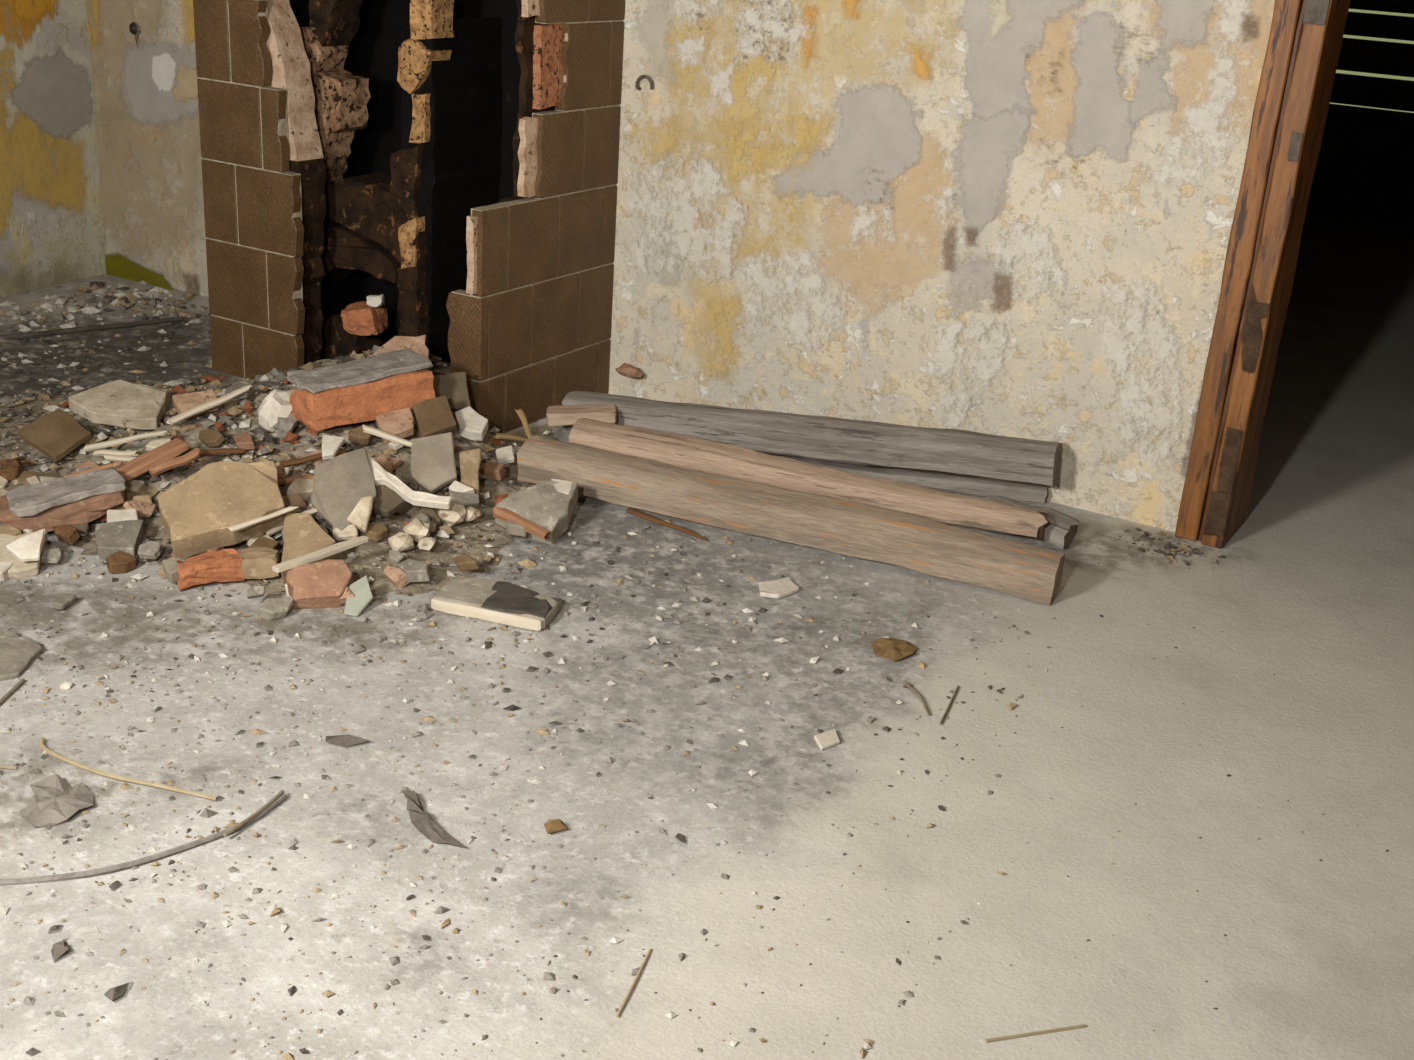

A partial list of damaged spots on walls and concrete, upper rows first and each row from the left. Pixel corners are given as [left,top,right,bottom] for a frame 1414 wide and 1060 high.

peeling [0,0,58,46]
peeling [11,49,92,140]
spalling [123,42,199,125]
spalling [626,159,846,351]
spalling [667,0,809,105]
peeling [773,84,923,242]
peeling [935,0,1257,430]
spalling [1096,279,1205,477]